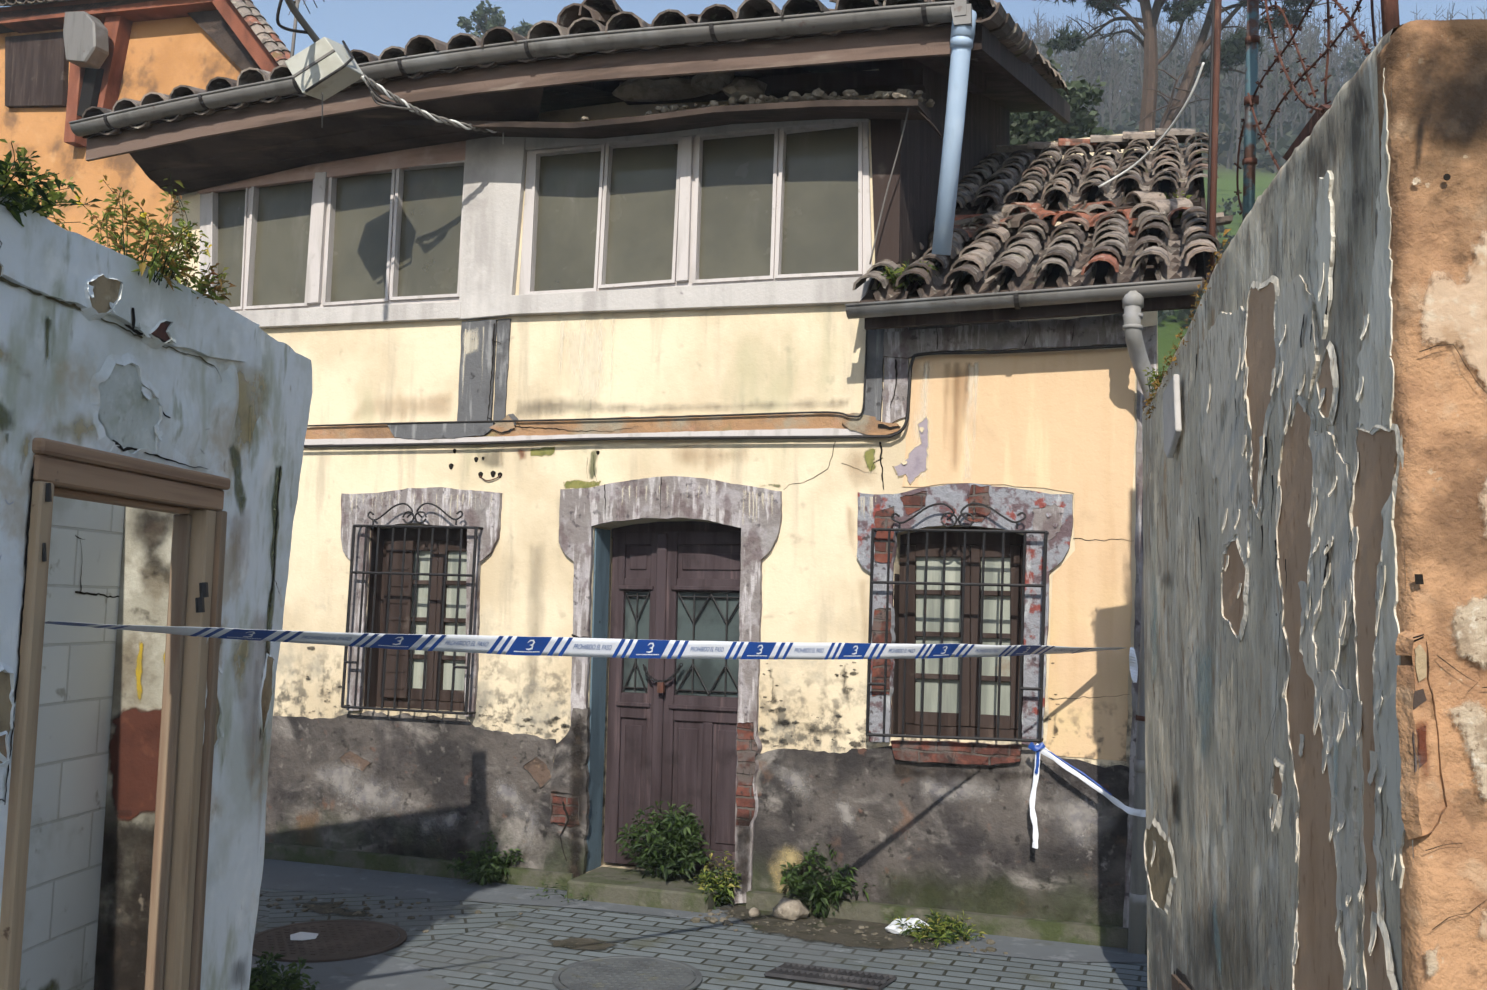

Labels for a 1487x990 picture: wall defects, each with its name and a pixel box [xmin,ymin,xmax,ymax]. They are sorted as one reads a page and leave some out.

flaking render [78,273,123,321]
peeling [89,319,177,461]
water stain [136,510,172,572]
peeling [874,416,930,563]
peeling [1199,68,1447,990]
flaking render [0,661,16,769]
water stain [760,670,866,747]
water stain [505,716,583,878]
water stain [737,817,751,891]
peeling [1144,818,1177,916]